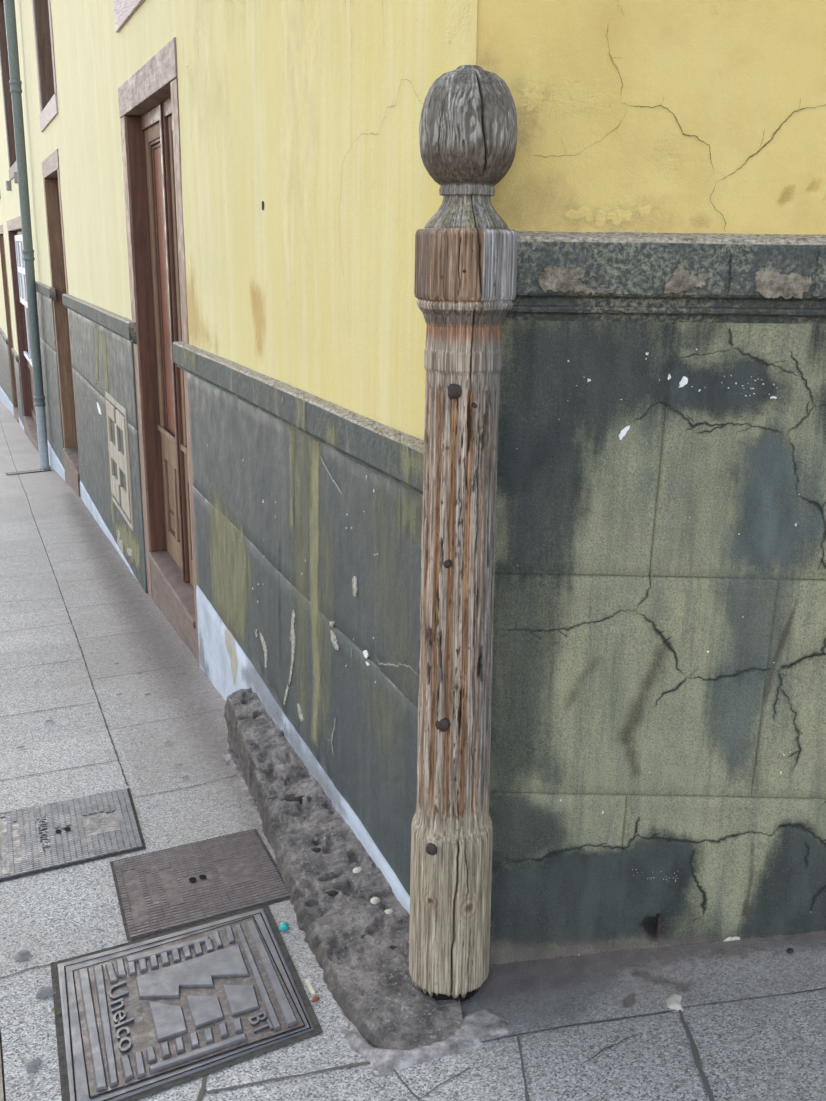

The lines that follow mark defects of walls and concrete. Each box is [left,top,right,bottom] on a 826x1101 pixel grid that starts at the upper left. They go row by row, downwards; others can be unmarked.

crack [606,0,824,294]
peeling [537,265,614,295]
peeling [663,263,709,294]
peeling [754,265,813,299]
crack [640,327,826,570]
damp [208,496,252,642]
damp [489,320,779,948]
crack [505,575,826,770]
damp [711,432,824,766]
crack [513,818,826,921]
damp [741,822,826,939]